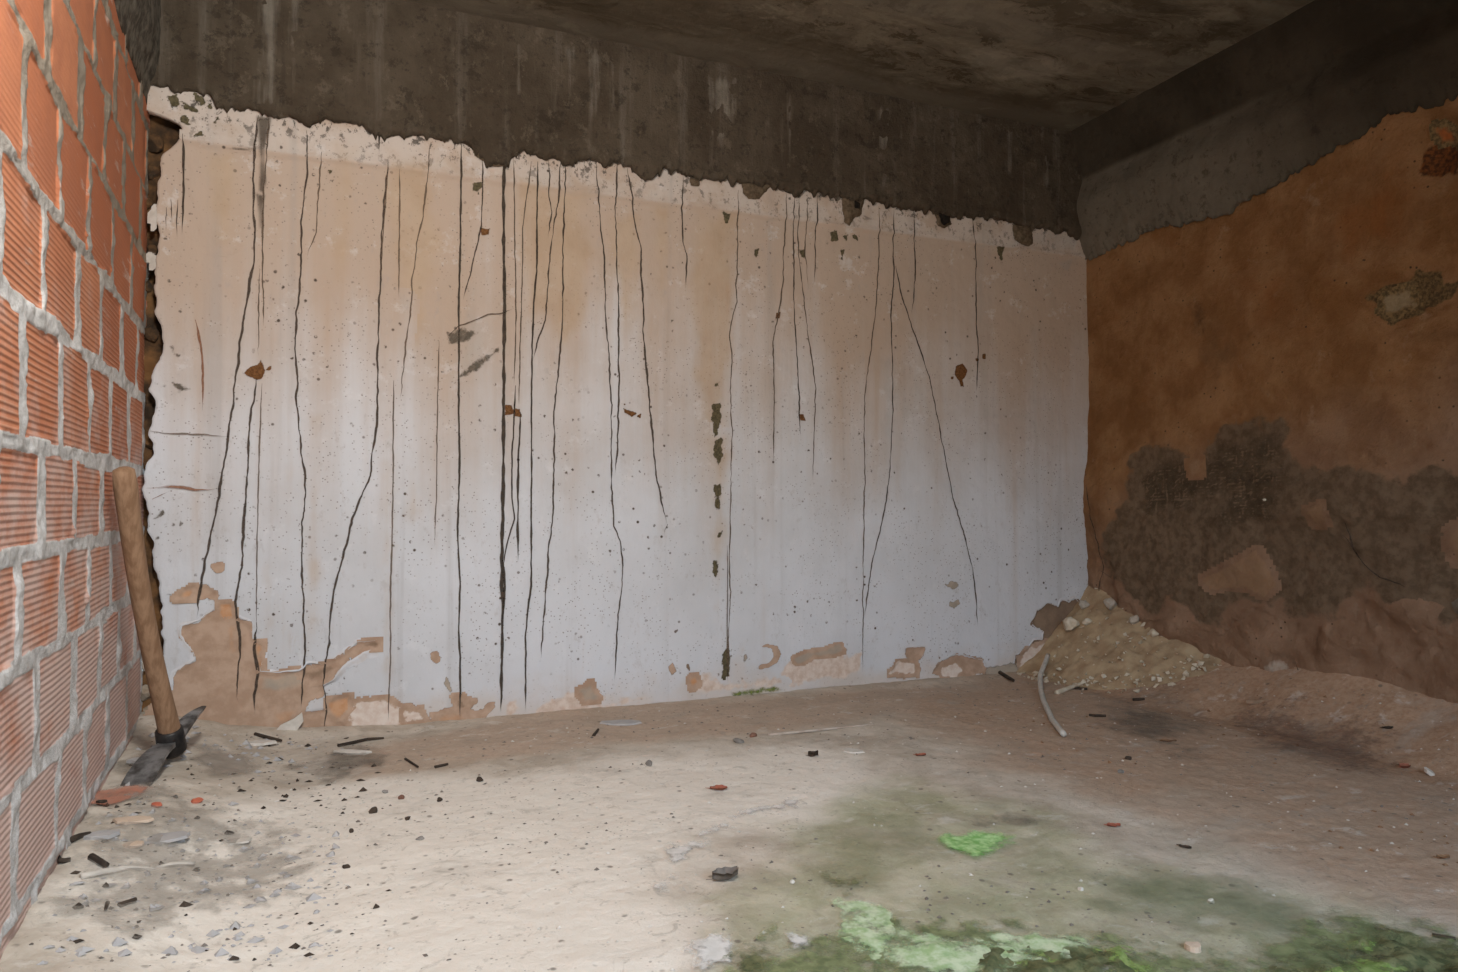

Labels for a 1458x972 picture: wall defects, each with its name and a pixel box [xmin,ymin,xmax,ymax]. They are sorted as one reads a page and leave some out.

crack [152,115,431,727]
peeling [143,107,659,746]
crack [451,162,509,333]
crack [534,163,668,672]
crack [728,190,739,661]
spalling [742,183,770,199]
peeling [669,638,866,700]
crack [772,195,818,464]
spalling [842,198,865,226]
crack [862,216,979,659]
peeling [887,596,1080,680]
leakage [1094,408,1458,636]